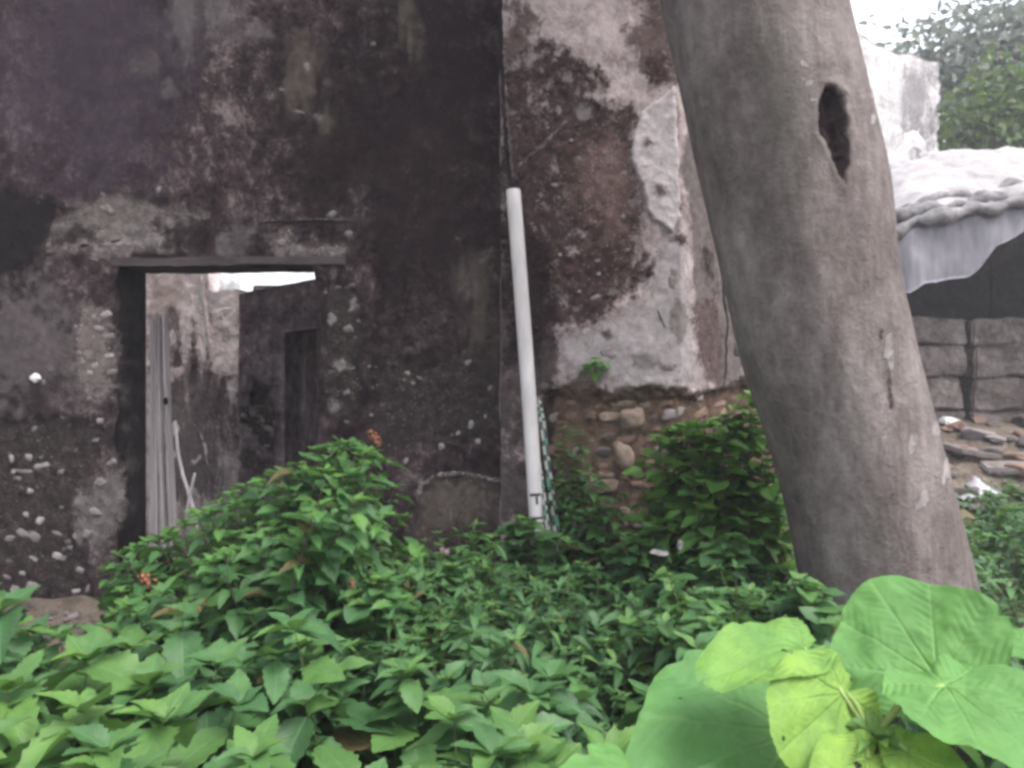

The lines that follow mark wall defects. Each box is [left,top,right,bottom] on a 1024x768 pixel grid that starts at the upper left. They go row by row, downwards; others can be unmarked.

damp [0,188,56,273]
spalling [0,301,129,599]
flaking render [41,185,212,261]
damp [158,279,240,517]
damp [201,0,657,537]
flaking render [631,85,687,246]
crack [722,288,730,385]